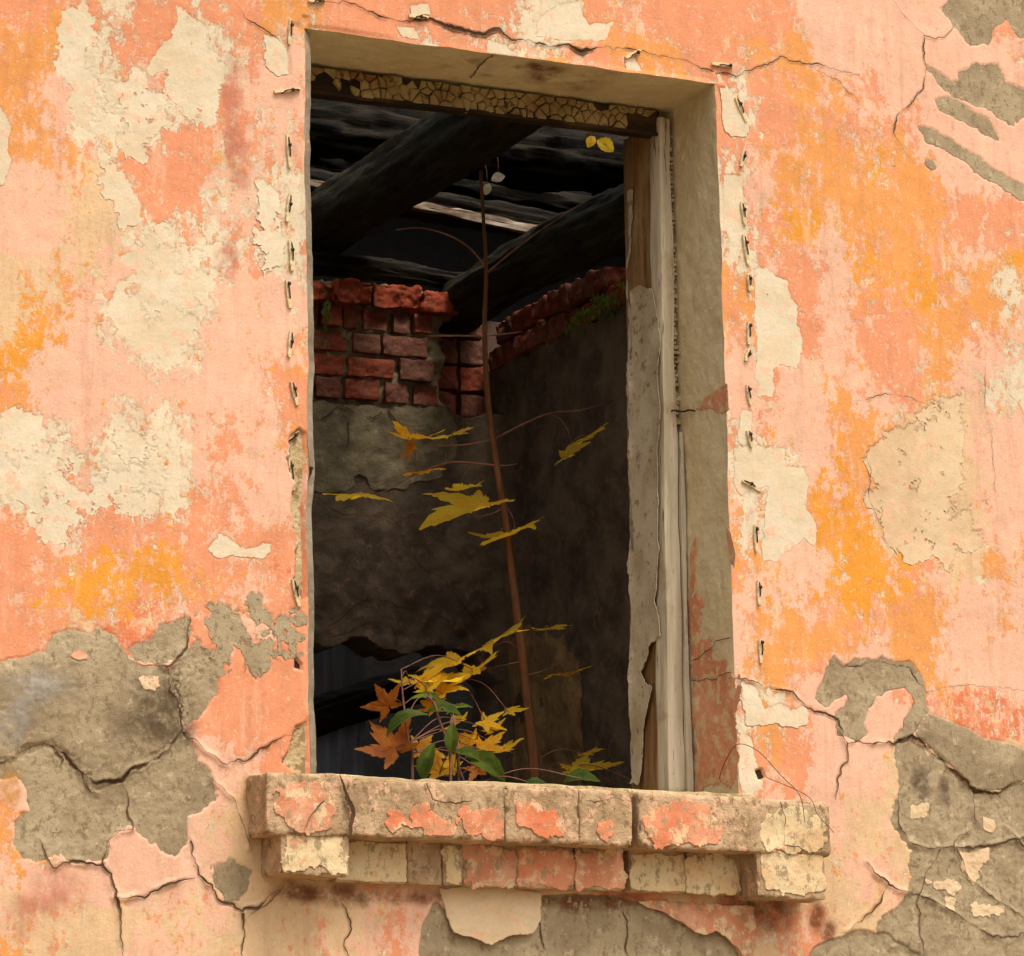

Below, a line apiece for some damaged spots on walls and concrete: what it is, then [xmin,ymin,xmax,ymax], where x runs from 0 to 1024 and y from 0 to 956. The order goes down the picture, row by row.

peeling [53,0,234,377]
crack [0,617,299,956]
flaking render [0,401,458,863]
crack [340,898,352,956]
crack [325,0,860,98]
peeling [626,189,661,785]
flaking render [273,536,1024,956]
peeling [754,267,803,397]
crack [691,637,1024,948]
peeling [861,389,985,574]
crack [893,8,955,164]
flaking render [926,63,1024,141]